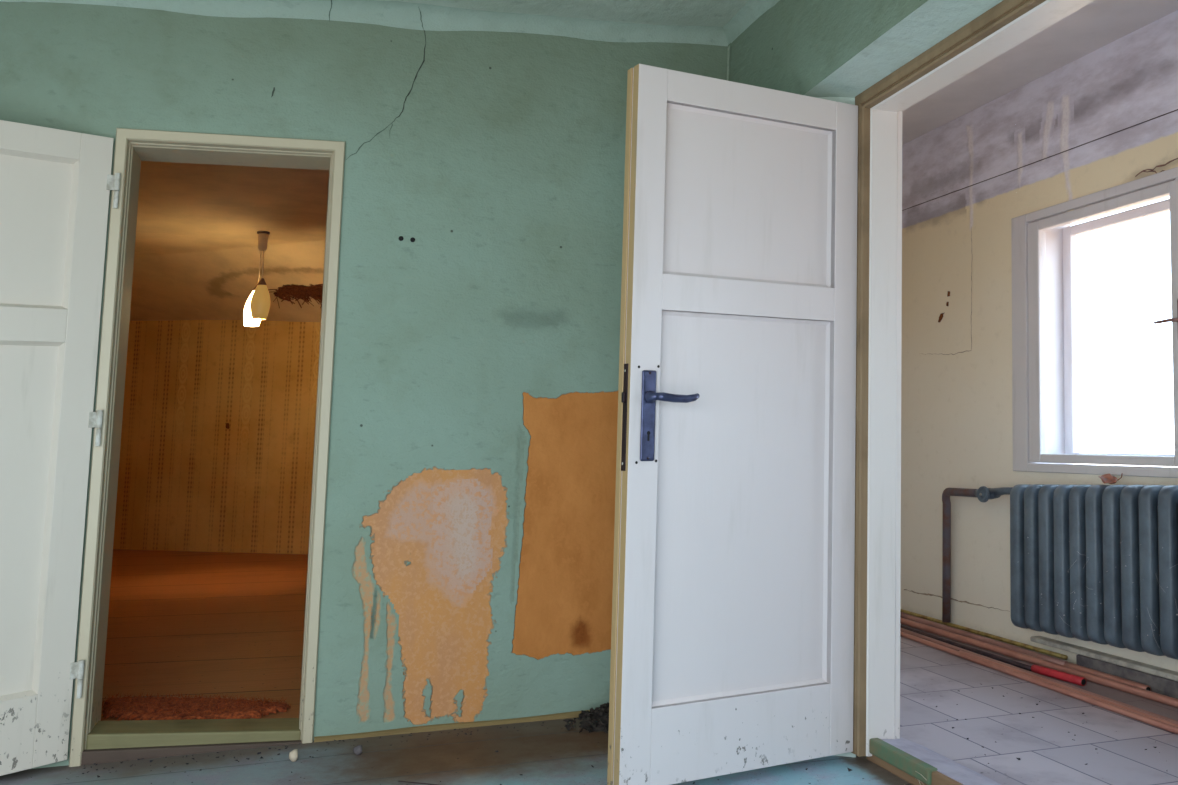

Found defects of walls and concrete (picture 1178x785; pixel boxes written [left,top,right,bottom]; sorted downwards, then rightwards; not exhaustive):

crack [346,7,426,160]
leakage [1014,88,1078,212]
peeling [349,387,618,727]